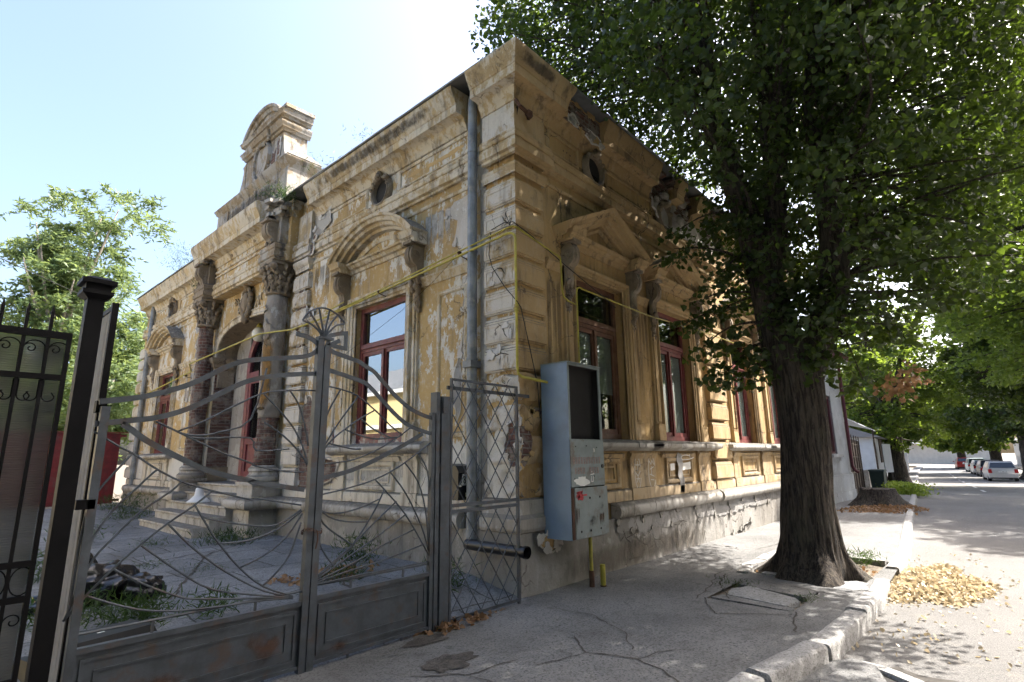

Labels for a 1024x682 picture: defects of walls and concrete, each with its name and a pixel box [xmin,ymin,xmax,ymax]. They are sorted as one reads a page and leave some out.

peeling [444,195,468,258]
peeling [486,322,512,361]
peeling [449,329,467,426]
spalling [503,407,542,472]
crack [428,607,695,682]